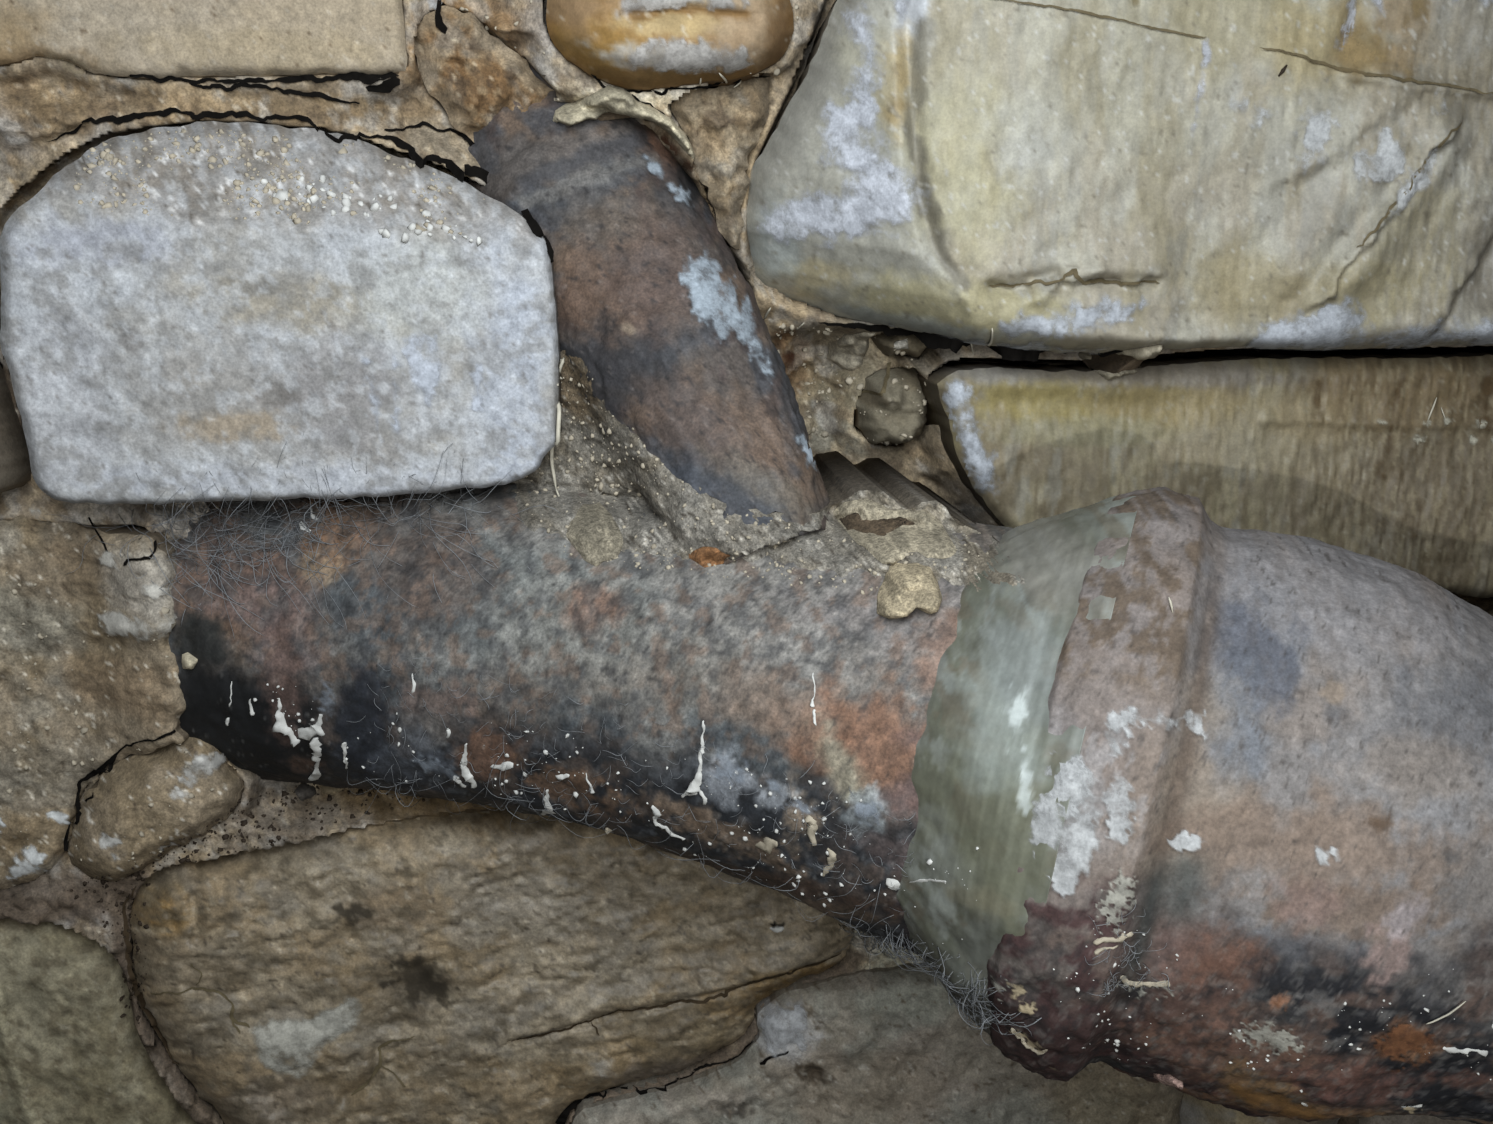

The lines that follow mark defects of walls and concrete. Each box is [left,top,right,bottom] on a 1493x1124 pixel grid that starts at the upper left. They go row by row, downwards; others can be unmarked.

crack [1009,0,1205,38]
crack [48,72,489,184]
crack [521,208,554,263]
water stain [1107,707,1205,754]
crack [63,730,176,852]
water stain [1030,756,1135,896]
water stain [1168,830,1201,851]
water stain [1315,847,1336,864]
water stain [1094,869,1137,955]
crack [513,952,842,1041]
water stain [1234,1021,1305,1055]